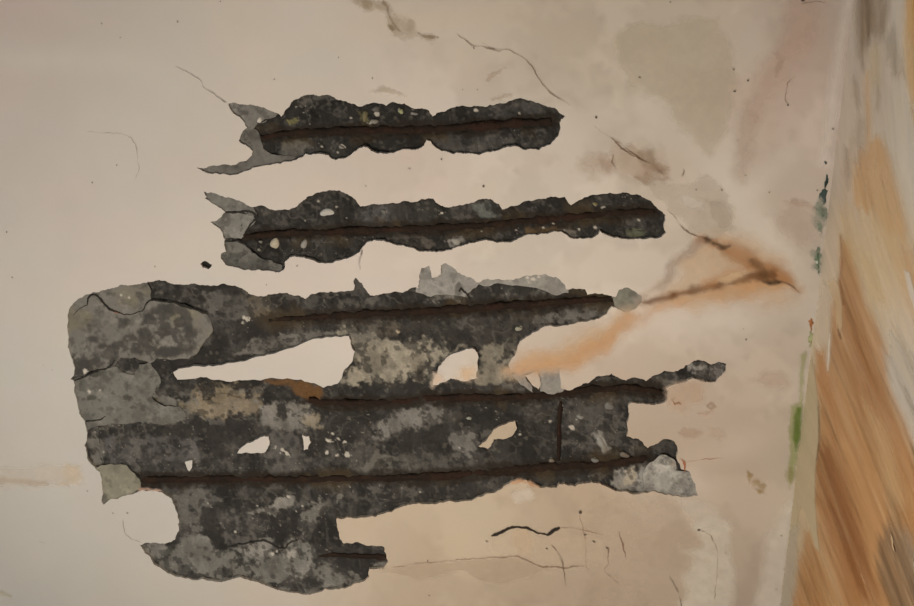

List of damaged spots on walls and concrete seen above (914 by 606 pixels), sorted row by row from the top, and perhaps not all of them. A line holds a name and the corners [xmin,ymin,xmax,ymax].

spalling [200,94,564,175]
spalling [205,190,665,272]
corrosion [642,236,793,310]
corrosion [516,313,637,373]
spalling [68,263,726,593]
crack [491,526,560,537]
crack [502,556,574,577]